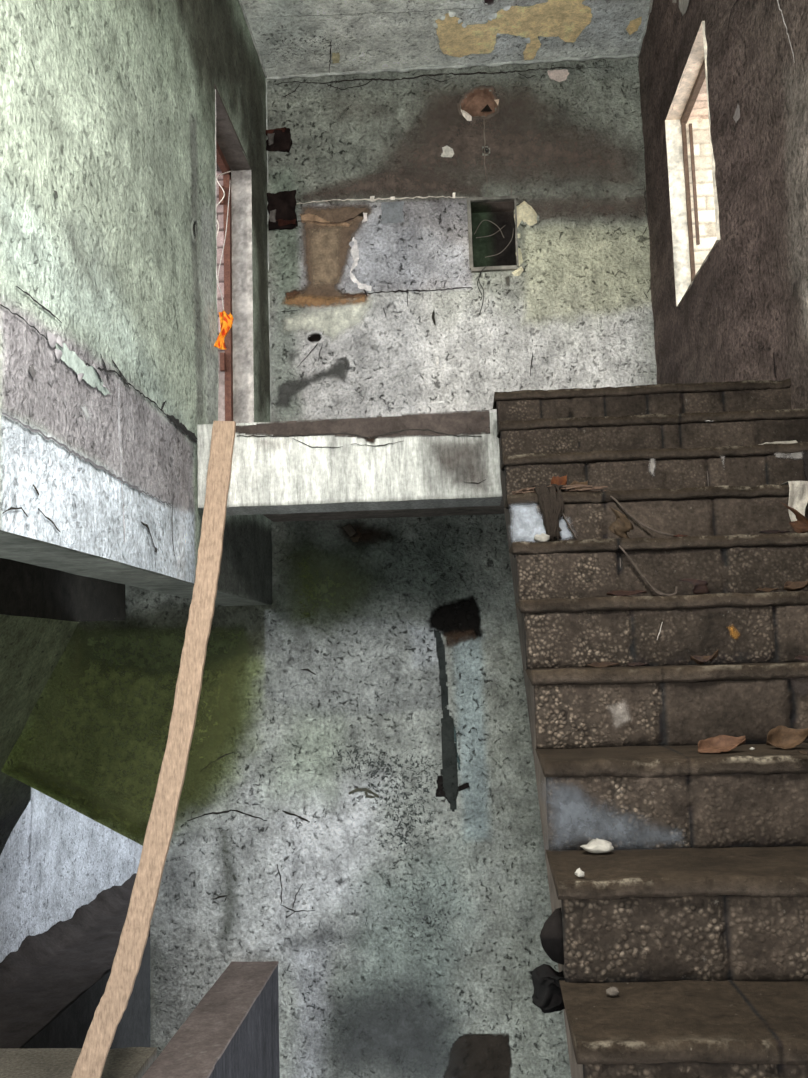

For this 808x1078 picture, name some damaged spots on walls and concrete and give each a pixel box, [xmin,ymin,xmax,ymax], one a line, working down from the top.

peeling [431,0,592,60]
peeling [672,0,689,16]
crack [0,286,62,340]
crack [85,354,197,444]